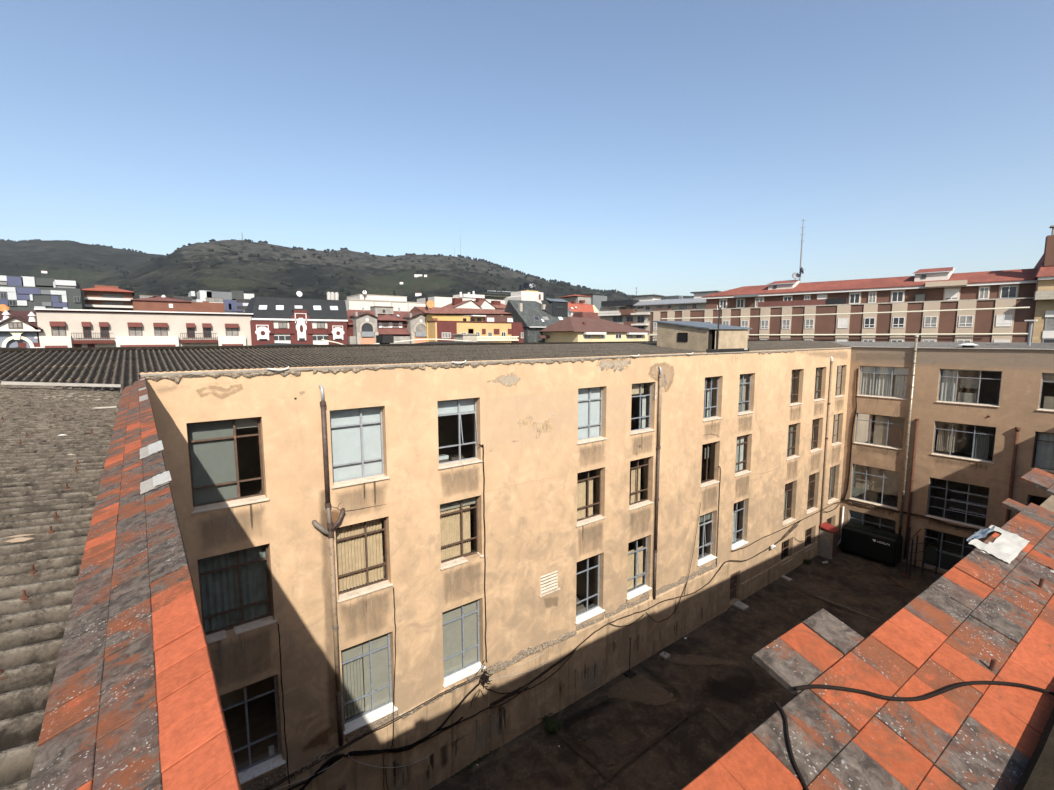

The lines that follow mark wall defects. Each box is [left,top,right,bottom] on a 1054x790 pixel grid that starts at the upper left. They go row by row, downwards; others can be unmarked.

flaking render [145,358,631,386]